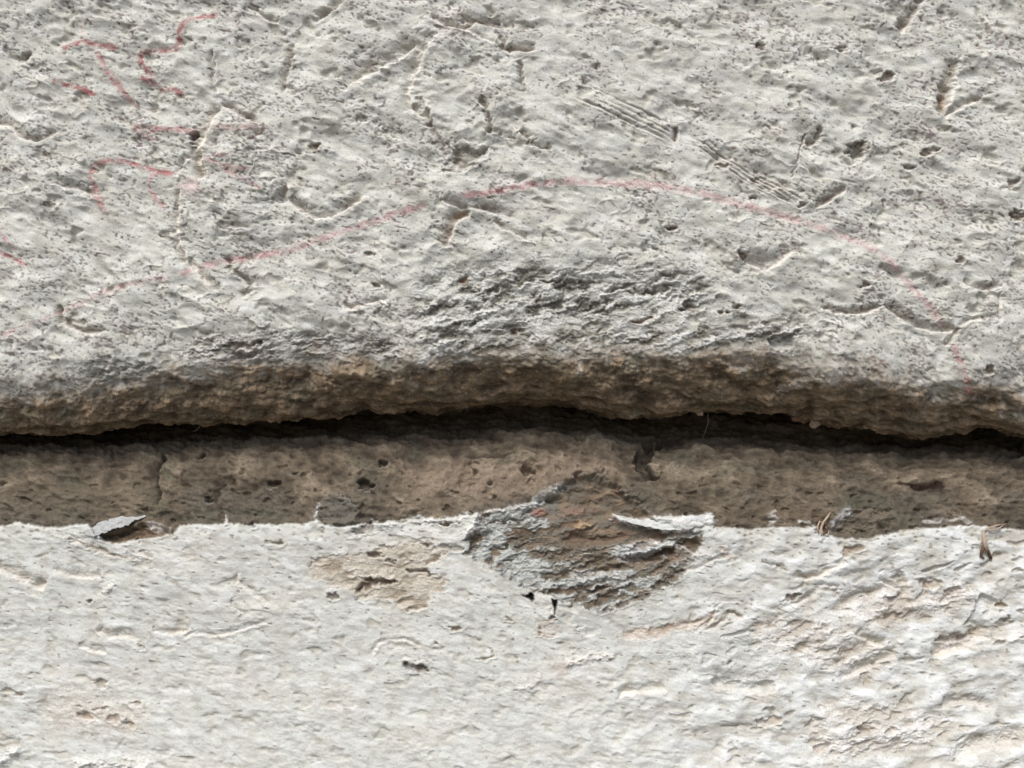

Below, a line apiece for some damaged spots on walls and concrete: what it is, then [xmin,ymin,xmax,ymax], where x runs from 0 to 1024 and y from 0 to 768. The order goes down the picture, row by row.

peeling [85,515,178,549]
spalling [245,519,288,550]
spalling [308,436,737,617]
spalling [823,503,901,563]